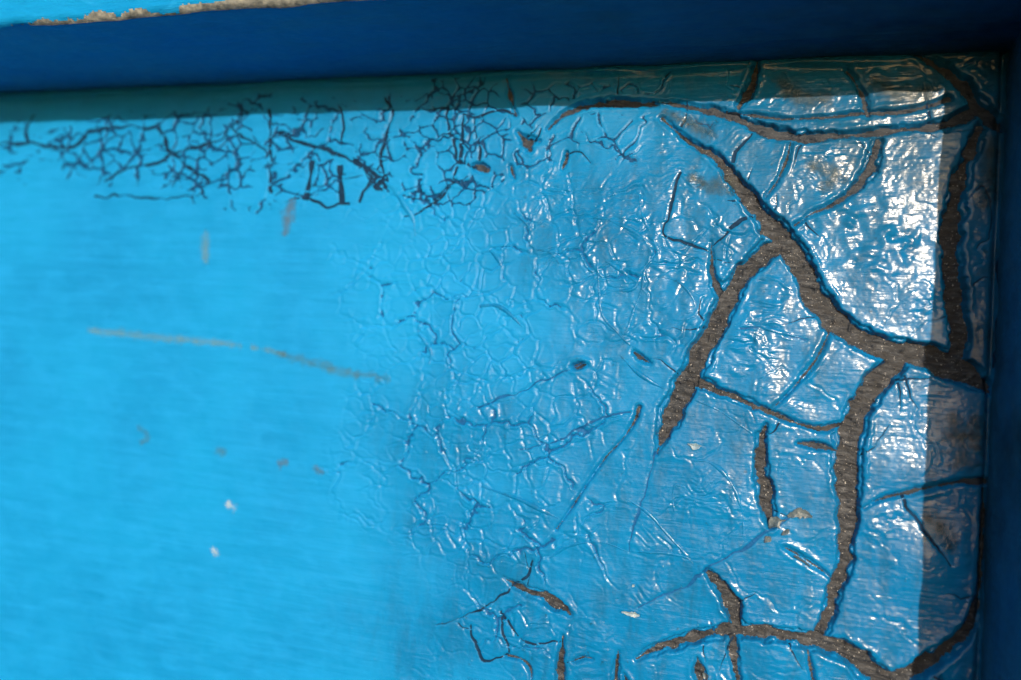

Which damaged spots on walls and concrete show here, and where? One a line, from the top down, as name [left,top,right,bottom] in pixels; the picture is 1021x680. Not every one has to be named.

peeling [11,0,366,26]
crack [0,76,517,217]
crack [494,212,568,277]
crack [369,267,467,378]
crack [510,56,1002,680]
crack [371,363,641,680]